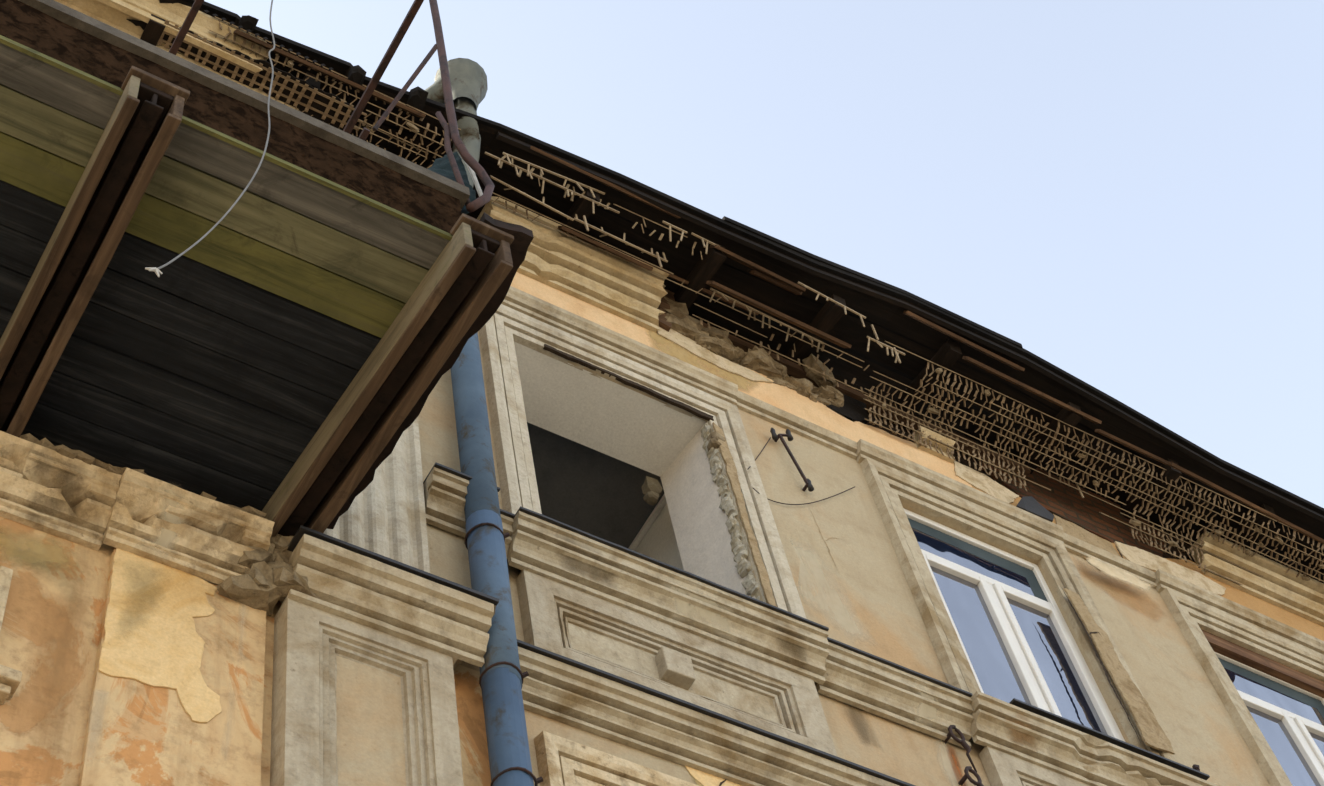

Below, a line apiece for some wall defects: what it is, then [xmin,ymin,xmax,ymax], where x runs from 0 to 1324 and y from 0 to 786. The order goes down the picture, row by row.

spalling [657,296,869,424]
spalling [19,433,149,477]
spalling [200,492,268,520]
spalling [543,344,777,607]
flaking render [953,459,1226,596]
peeling [98,534,319,723]